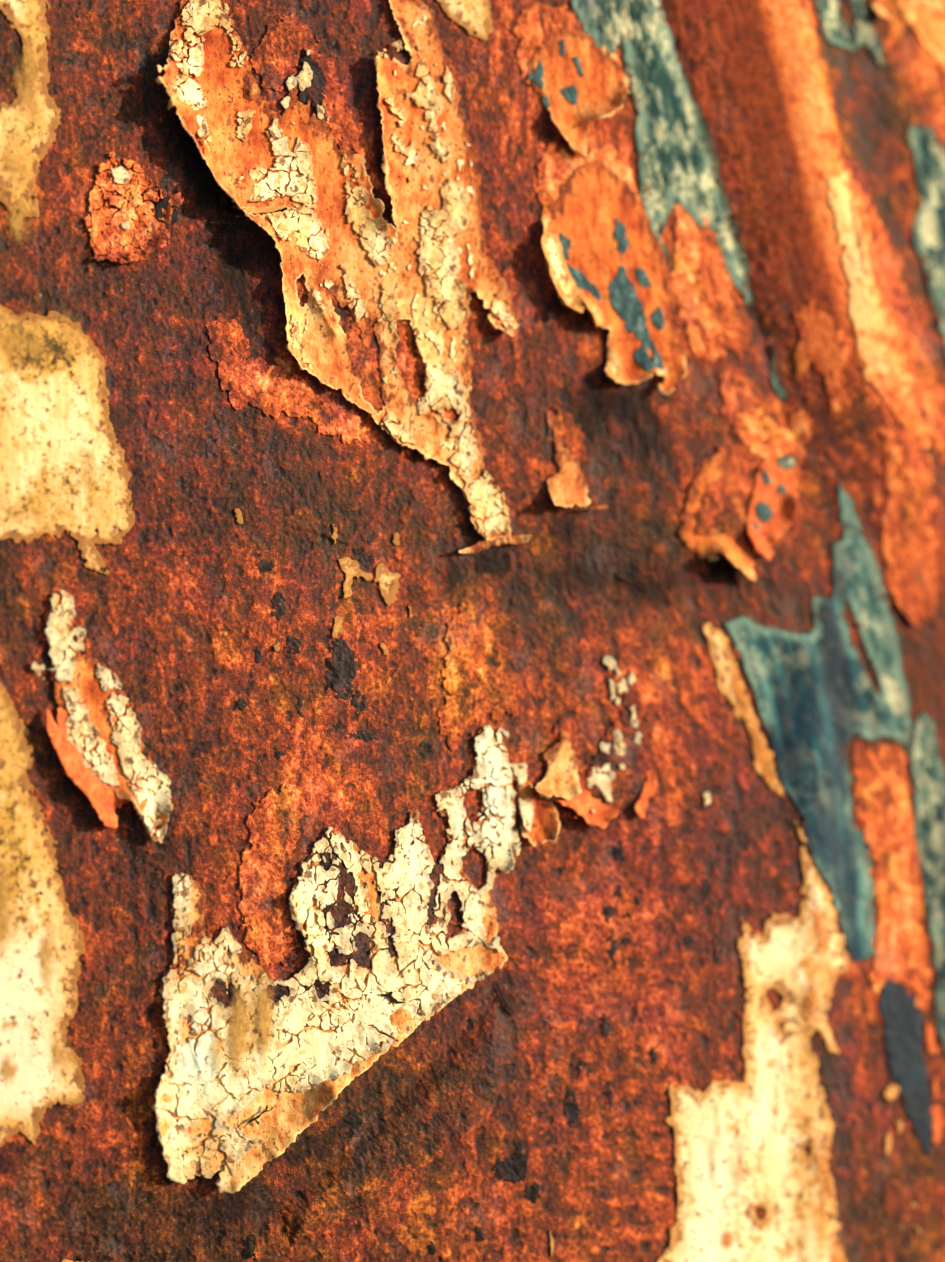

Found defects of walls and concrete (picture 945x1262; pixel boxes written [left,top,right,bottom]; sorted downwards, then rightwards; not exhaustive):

rust [205,295,426,444]
peeling [156,0,531,554]
peeling [527,0,758,395]
rust [671,203,813,470]
rust [792,168,945,627]
peeling [31,590,173,843]
crack [243,1105,275,1128]
rust [237,783,313,966]
crack [381,991,404,1004]
peeling [152,656,657,1193]
peeling [657,483,945,1262]
rust [851,740,932,1010]